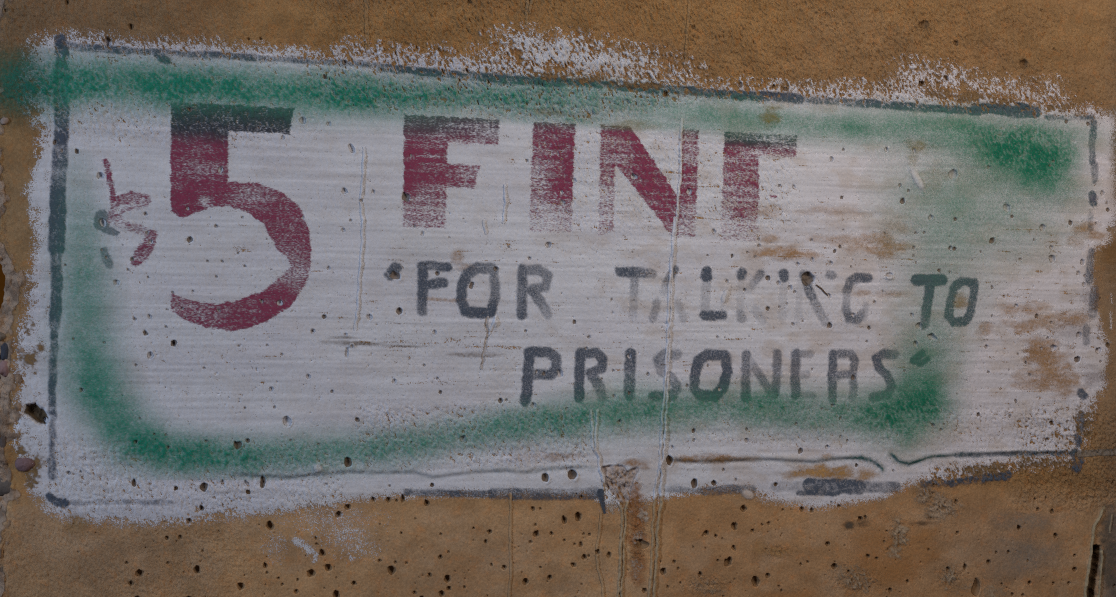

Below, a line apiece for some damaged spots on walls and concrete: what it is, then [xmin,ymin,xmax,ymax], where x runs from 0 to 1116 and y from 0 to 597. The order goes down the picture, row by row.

spalling [601,465,639,503]